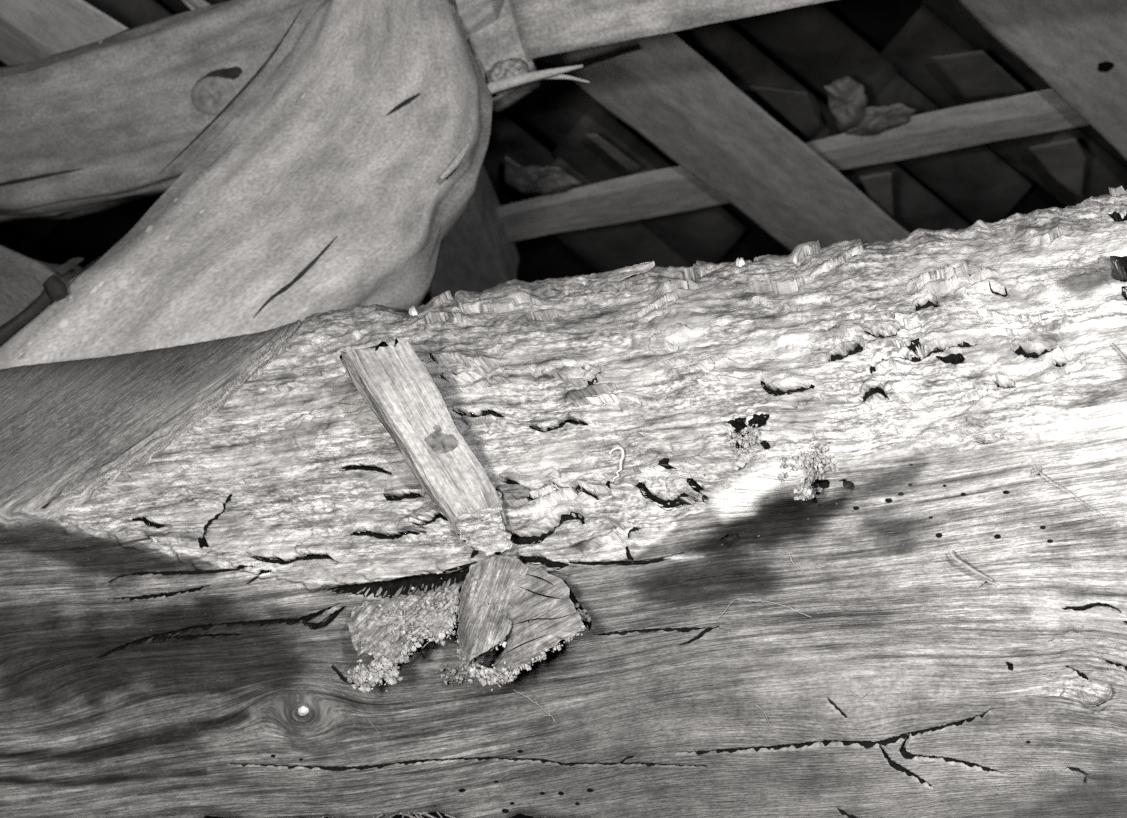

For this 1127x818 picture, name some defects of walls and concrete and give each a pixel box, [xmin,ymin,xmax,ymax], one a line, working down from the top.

spalling [318,561,477,599]
crack [99,603,345,658]
crack [1061,603,1127,624]
crack [1066,659,1127,680]
crack [229,698,997,787]